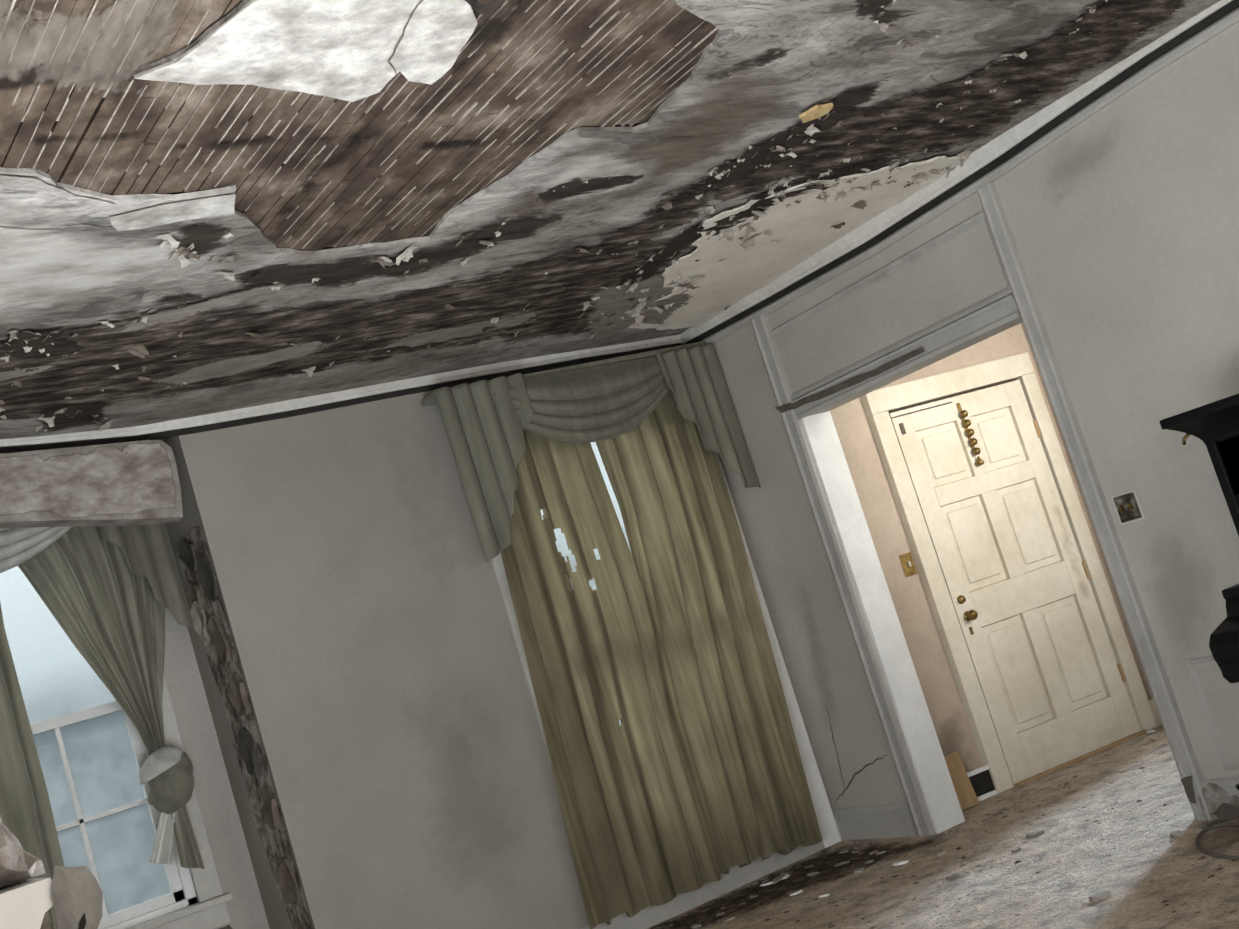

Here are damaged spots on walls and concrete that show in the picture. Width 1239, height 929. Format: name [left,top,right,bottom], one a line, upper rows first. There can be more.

crack [388,0,423,74]
crack [465,0,499,10]
crack [0,225,119,233]
spalling [0,0,717,308]
water stain [0,0,1185,427]
peeling [583,148,971,340]
peeling [674,79,891,200]